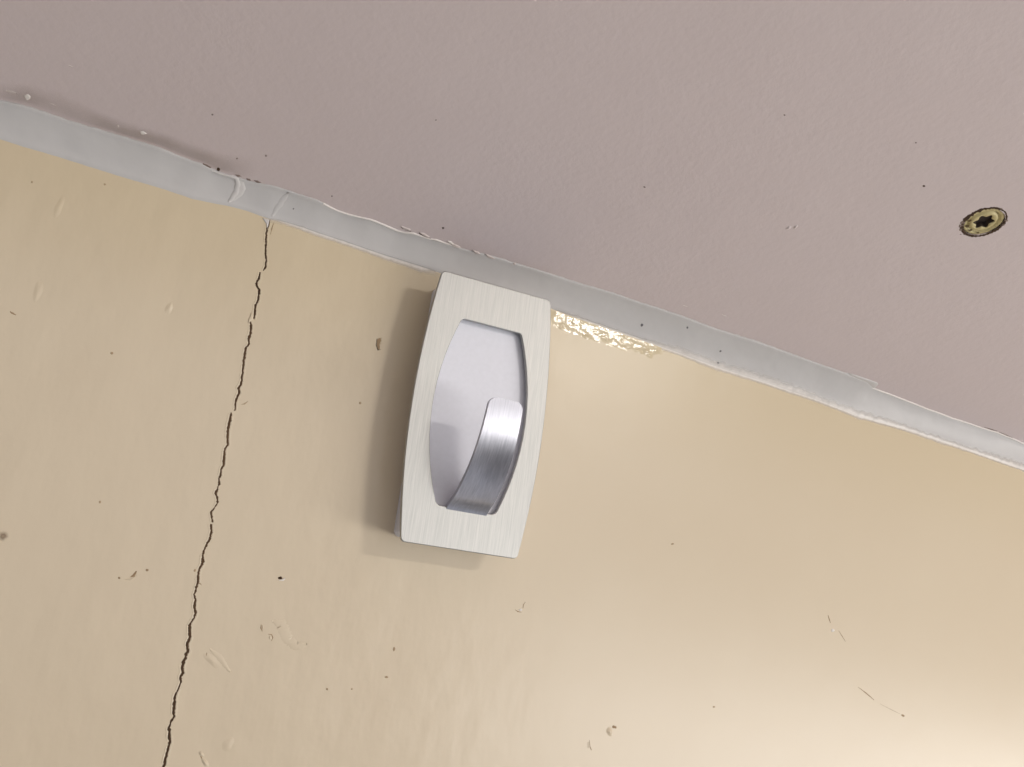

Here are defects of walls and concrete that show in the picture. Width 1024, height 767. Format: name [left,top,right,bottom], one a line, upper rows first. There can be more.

crack [161,218,274,767]